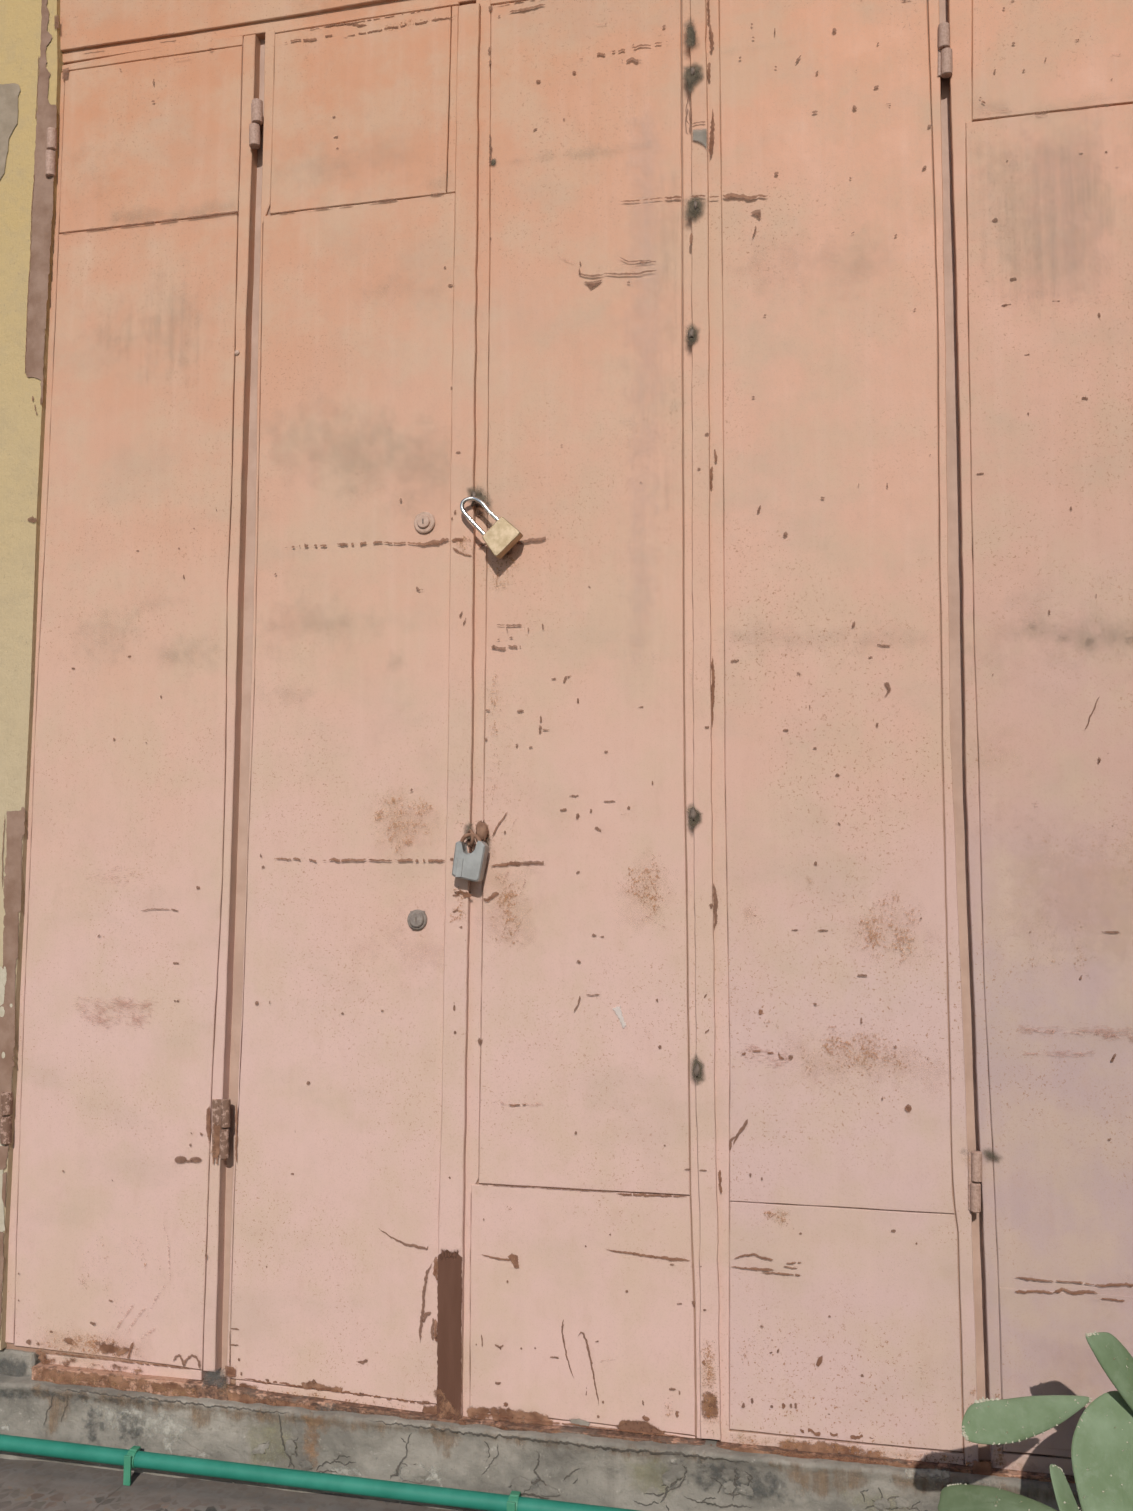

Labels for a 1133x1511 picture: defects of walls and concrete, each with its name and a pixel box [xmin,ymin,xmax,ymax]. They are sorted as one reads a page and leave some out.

peeling [0,0,59,415]
rust [285,536,487,556]
rust [705,658,715,728]
rust [260,784,454,868]
peeling [0,807,25,1117]
rust [742,1018,909,1072]
rust [175,1104,238,1164]
peeling [0,1144,19,1327]
rust [1015,1277,1133,1302]
crack [43,1388,355,1473]
rust [26,1322,1076,1490]
crack [367,1419,754,1511]